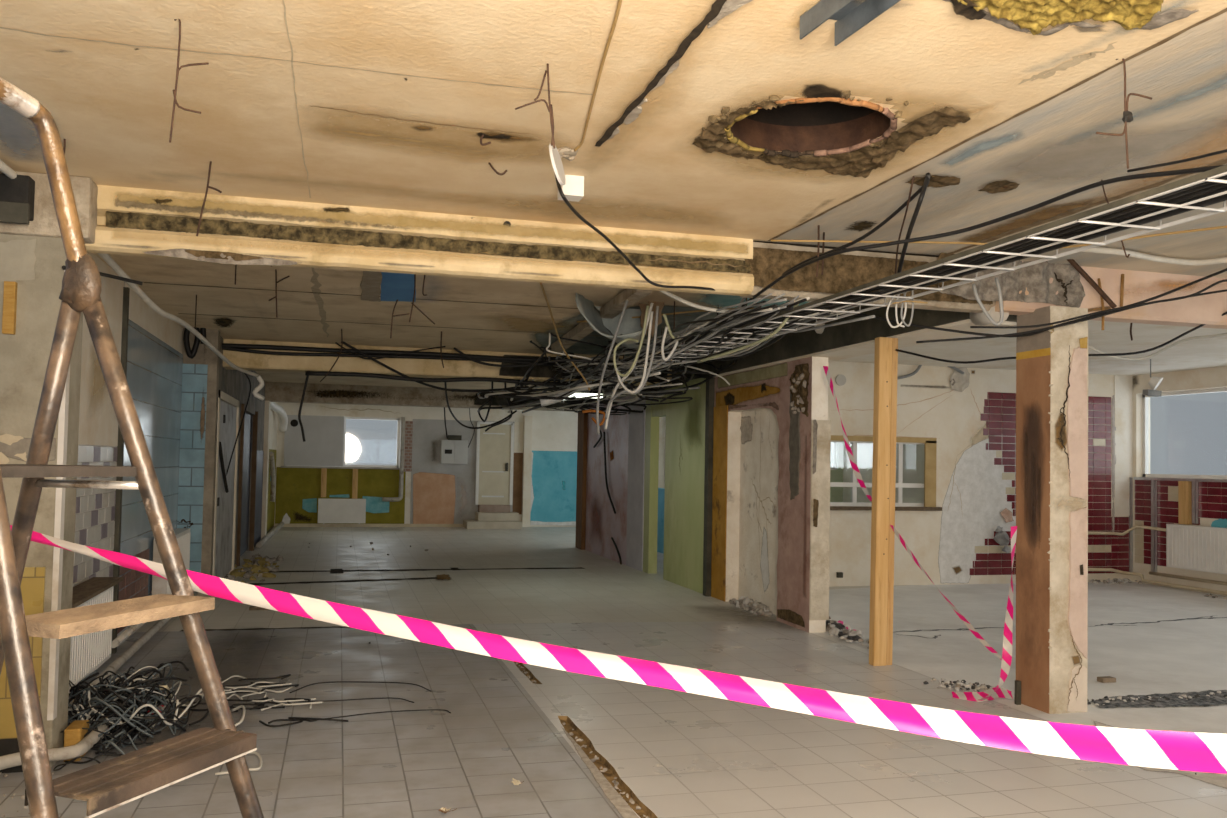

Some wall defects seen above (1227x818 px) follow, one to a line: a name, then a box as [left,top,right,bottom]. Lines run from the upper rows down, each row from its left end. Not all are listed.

spalling [944,0,1198,36]
spalling [693,100,971,178]
spalling [744,240,954,294]
spalling [890,259,1117,309]
flaking render [938,433,1016,583]